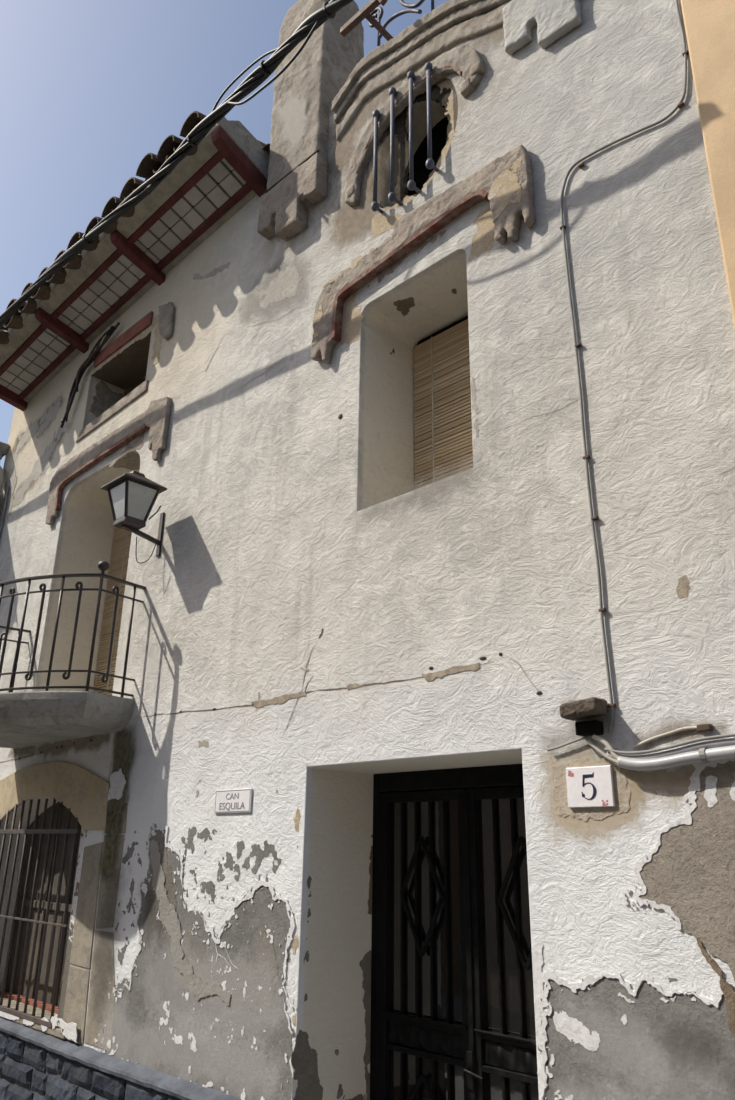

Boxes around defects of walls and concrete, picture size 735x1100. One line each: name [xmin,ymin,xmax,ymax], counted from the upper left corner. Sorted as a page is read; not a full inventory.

peeling [468,158,522,261]
peeling [336,230,446,346]
crack [131,628,542,734]
damp [9,729,134,880]
peeling [94,824,323,1100]
spalling [359,950,371,1100]
peeling [531,758,735,1100]